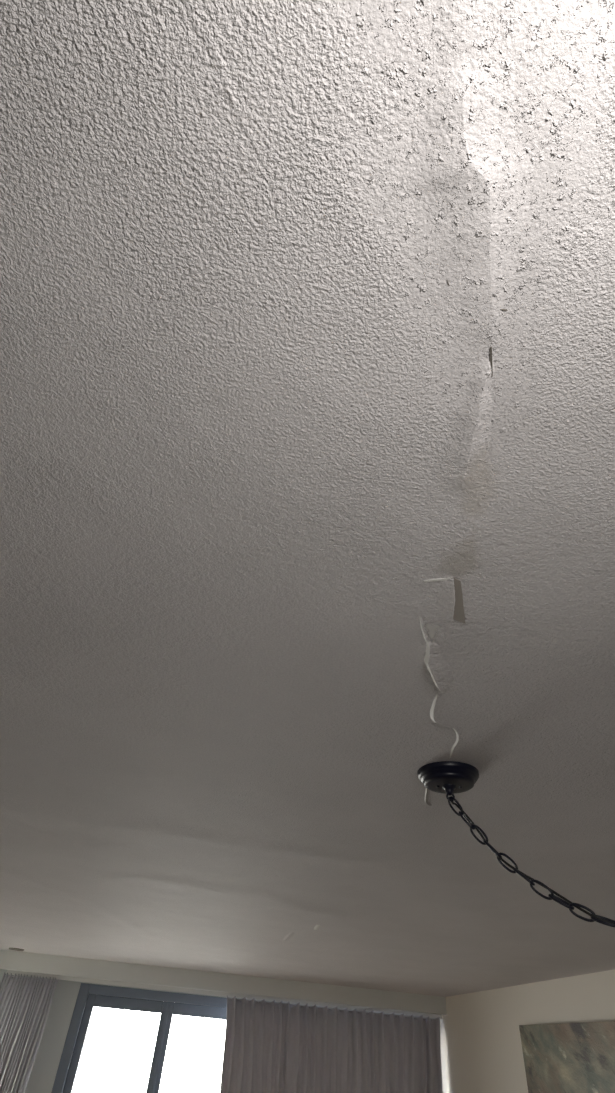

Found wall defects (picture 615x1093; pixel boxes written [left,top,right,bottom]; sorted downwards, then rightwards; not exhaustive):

crack [419,616,499,758]